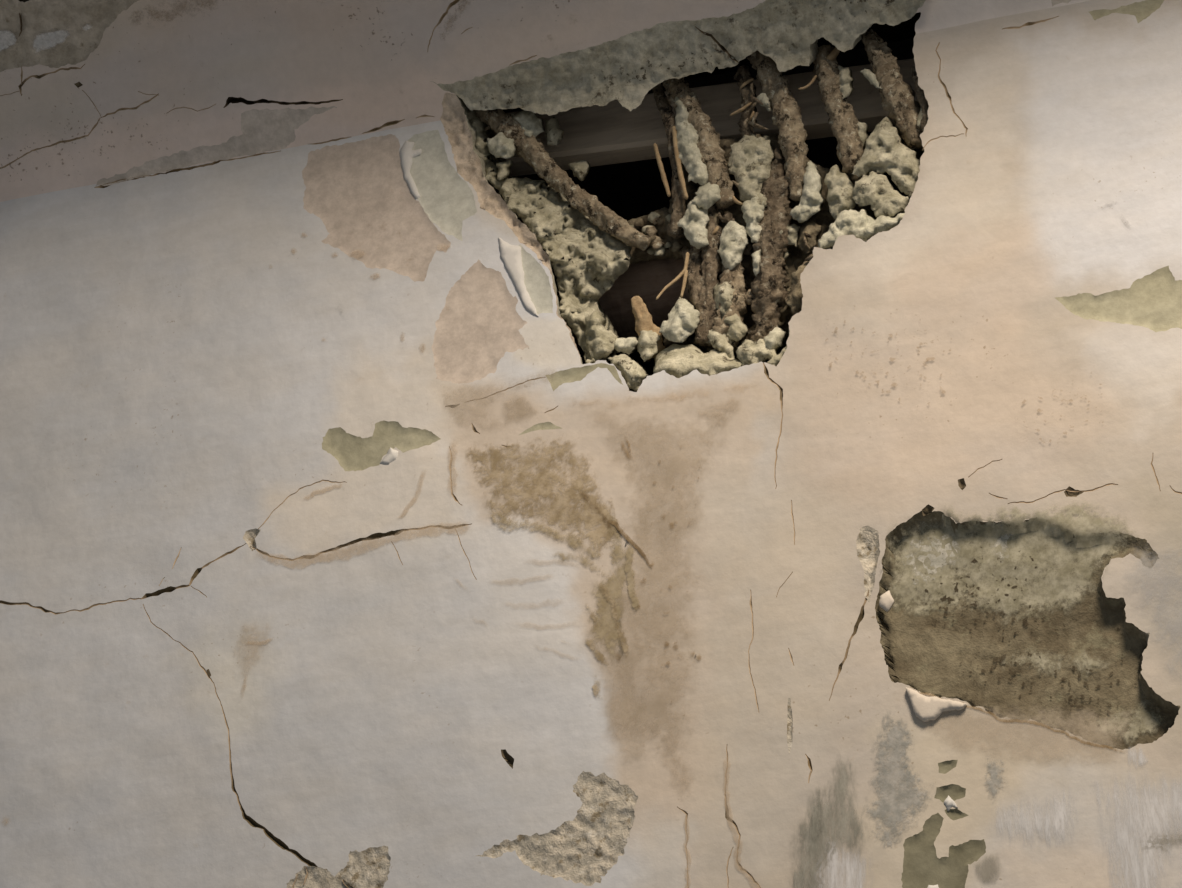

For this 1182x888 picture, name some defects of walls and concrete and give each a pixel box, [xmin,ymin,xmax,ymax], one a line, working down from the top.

crack [0,64,343,169]
flaking render [302,0,926,391]
peeling [322,421,440,471]
crack [445,377,546,448]
crack [0,446,477,888]
damp [467,425,701,736]
flaking render [856,486,1180,750]
flaking render [477,771,638,886]
crack [724,746,761,888]
mould [794,719,928,888]
peeling [901,760,986,888]
damp [976,857,997,881]